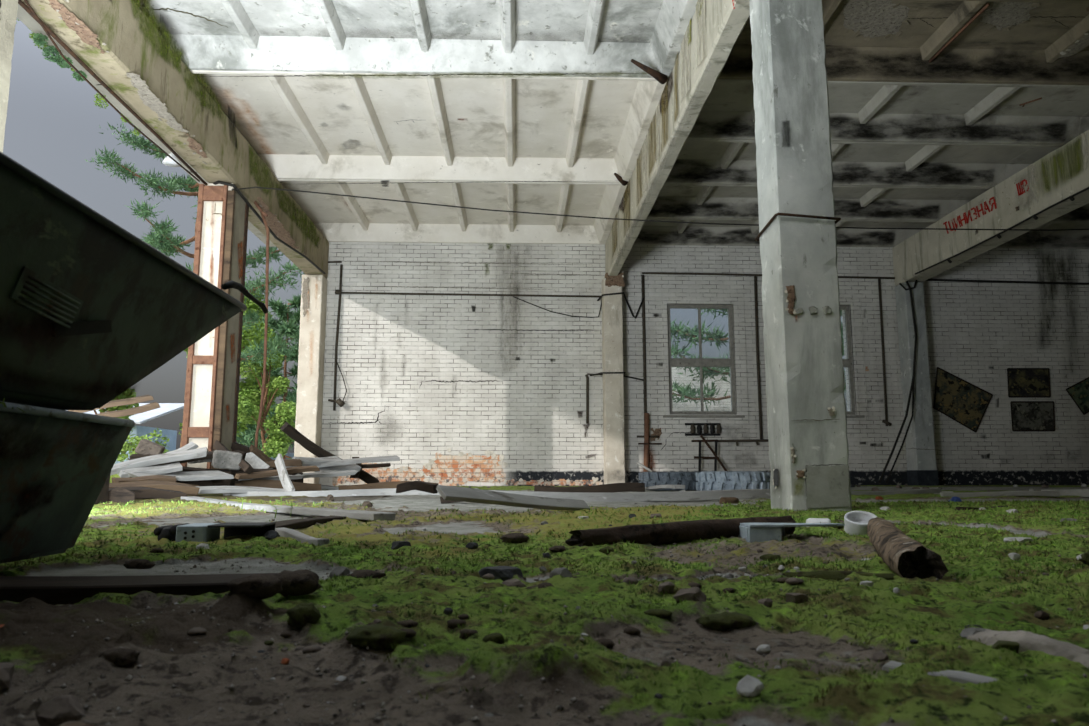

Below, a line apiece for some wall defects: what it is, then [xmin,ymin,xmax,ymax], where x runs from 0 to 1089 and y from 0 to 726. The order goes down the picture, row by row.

crack [142,2,228,32]
peeling [126,73,208,165]
flaking render [332,448,603,486]